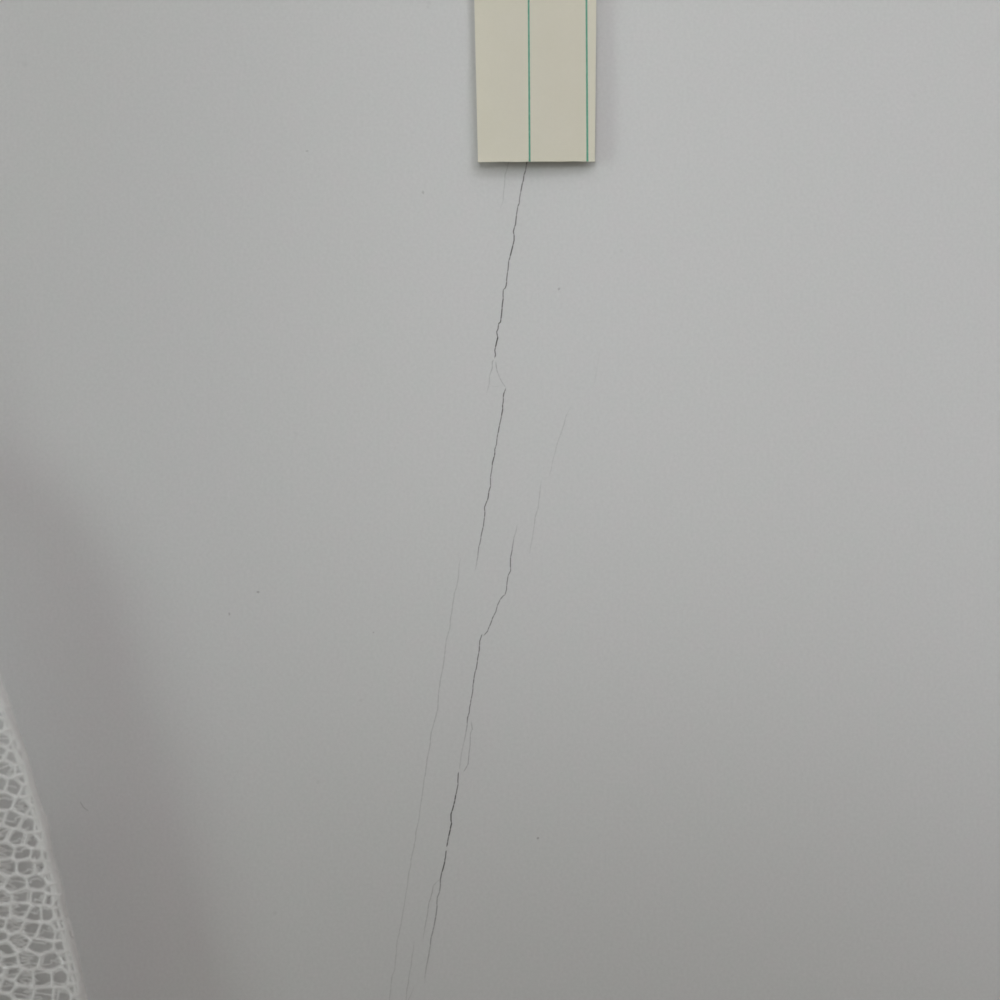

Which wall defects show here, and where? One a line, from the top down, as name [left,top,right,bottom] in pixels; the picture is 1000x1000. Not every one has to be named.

crack [389,162,542,1000]